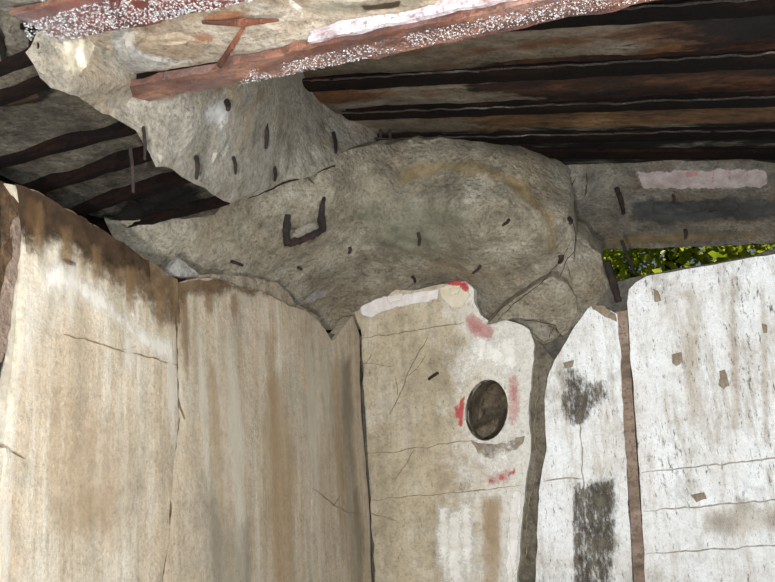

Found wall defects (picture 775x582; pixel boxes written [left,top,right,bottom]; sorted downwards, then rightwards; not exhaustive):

spalling [202,18,279,69]
spalling [26,28,622,331]
spalling [0,181,19,294]
leakage [15,184,269,362]
spalling [508,318,561,344]
crack [64,321,185,450]
leakage [561,367,606,425]
crack [0,444,25,459]
leakage [573,481,615,582]